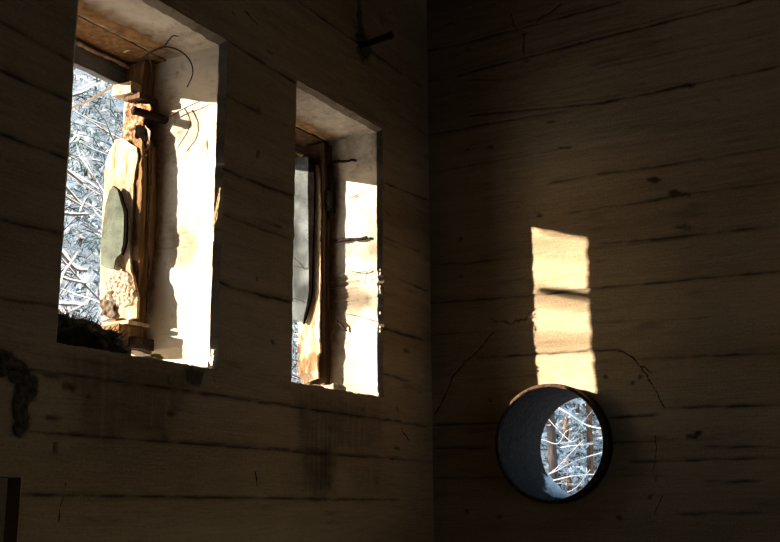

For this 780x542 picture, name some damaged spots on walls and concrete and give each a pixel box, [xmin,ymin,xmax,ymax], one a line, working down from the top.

crack [619,350,666,408]